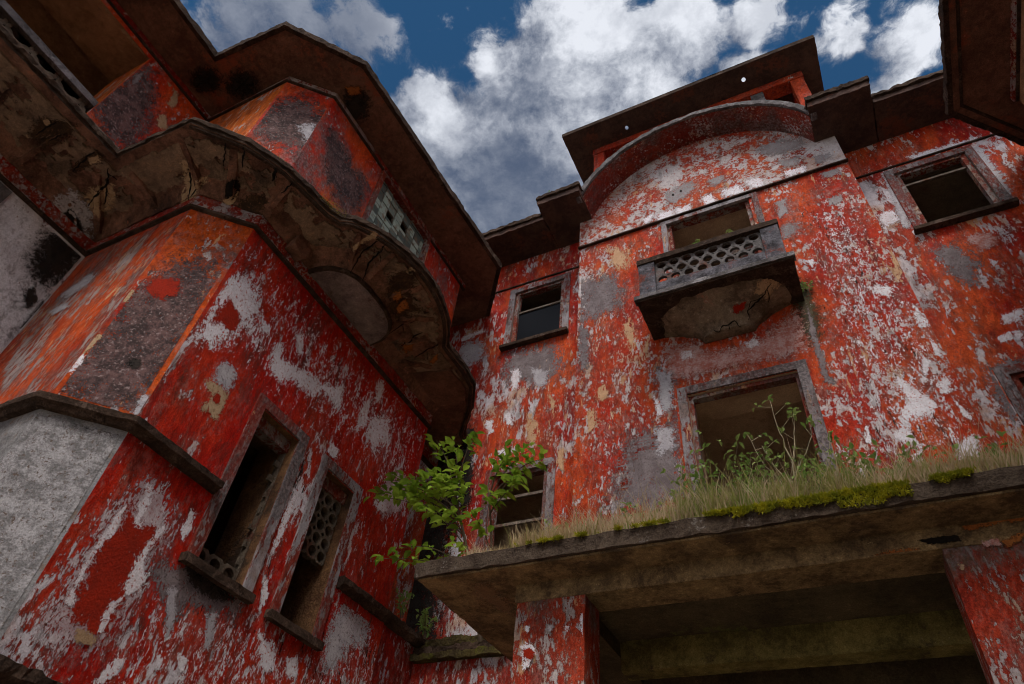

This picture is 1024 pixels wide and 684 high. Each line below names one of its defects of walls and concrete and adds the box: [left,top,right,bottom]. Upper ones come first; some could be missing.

peeling [642,178,767,224]
peeling [784,165,807,178]
leakage [19,227,81,329]
crack [714,284,771,332]
peeling [805,173,981,466]
peeling [997,306,1024,343]
peeling [194,261,425,523]
peeling [459,329,571,490]
peeling [29,461,377,684]